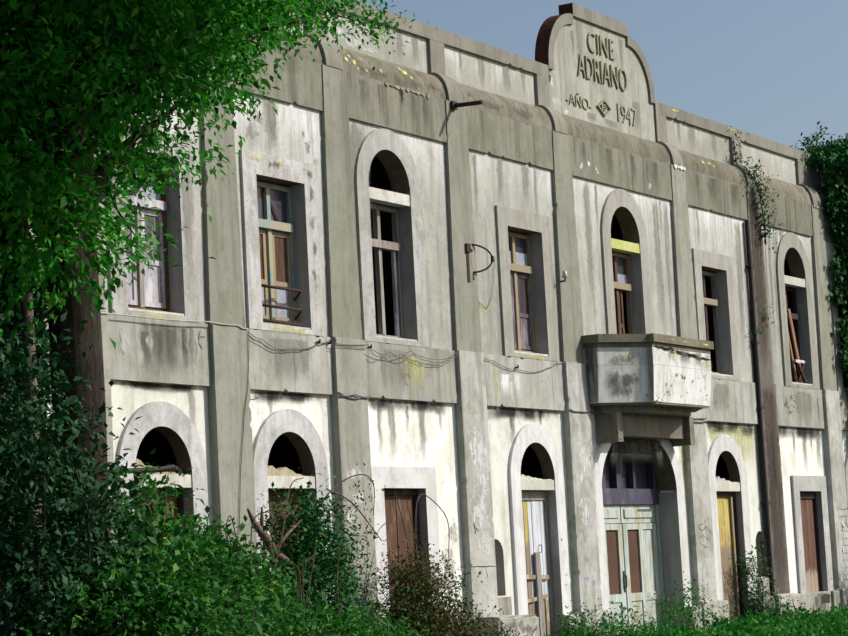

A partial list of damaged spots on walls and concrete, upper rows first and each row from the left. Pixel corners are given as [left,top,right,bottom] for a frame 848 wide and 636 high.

water stain [610,356,637,394]
water stain [371,399,442,440]
water stain [708,422,753,458]